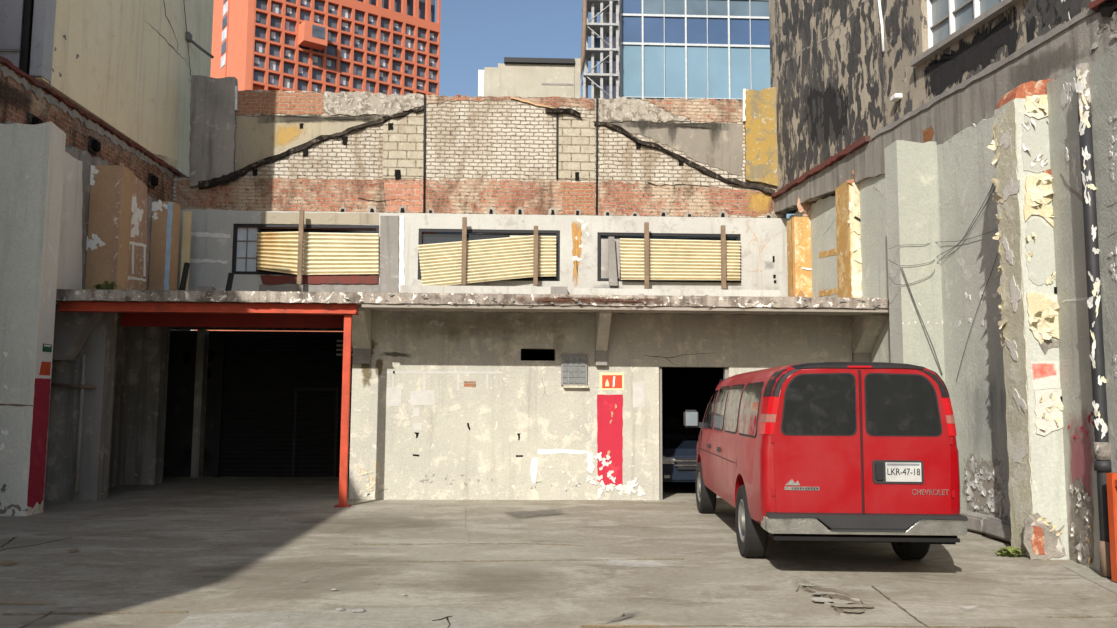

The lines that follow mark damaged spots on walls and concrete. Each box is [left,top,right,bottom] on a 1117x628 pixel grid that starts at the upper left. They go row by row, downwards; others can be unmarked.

crack [151,0,186,61]
peeling [1108,111,1117,181]
peeling [86,233,105,251]
peeling [958,68,1096,361]
peeling [1087,225,1117,385]
spalling [357,462,384,498]
peeling [522,451,645,498]
spalling [963,447,1028,519]
peeling [1023,478,1094,566]